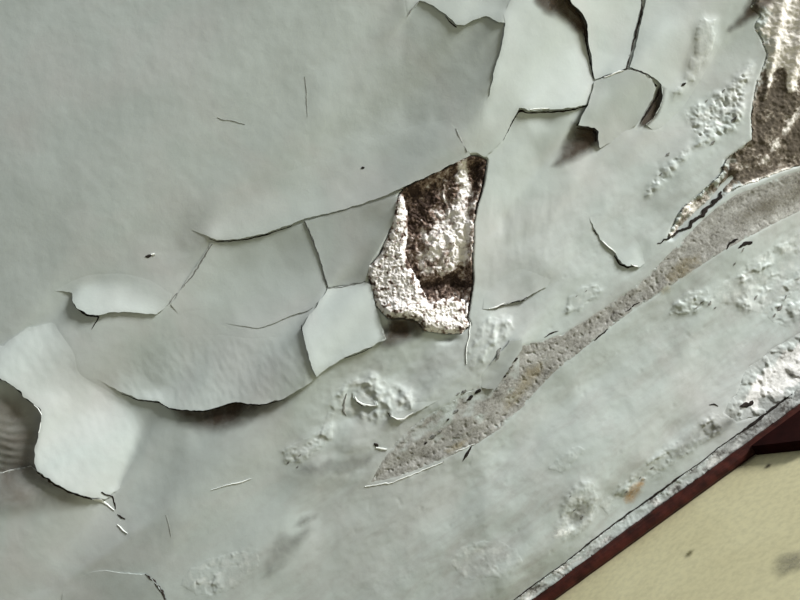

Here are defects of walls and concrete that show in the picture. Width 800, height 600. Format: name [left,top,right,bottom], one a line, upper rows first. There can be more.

crack [603,0,657,87]
crack [168,244,213,305]
crack [305,222,365,288]
peeling [0,0,732,510]
spalling [371,0,800,482]
spalling [517,333,800,600]